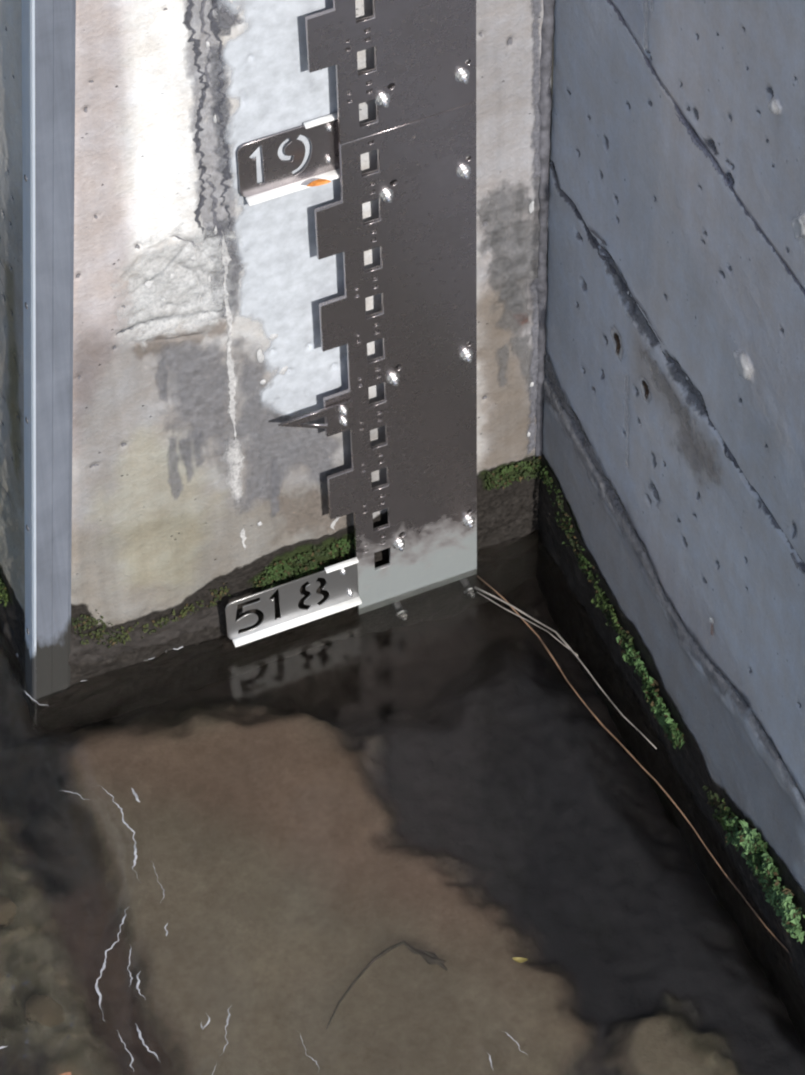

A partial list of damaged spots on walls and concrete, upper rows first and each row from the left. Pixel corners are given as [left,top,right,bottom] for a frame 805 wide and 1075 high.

crack [183,0,240,284]
leakage [212,47,232,172]
leakage [215,0,241,35]
leakage [157,219,337,517]
crack [527,278,539,454]
crack [529,0,805,573]
leakage [68,517,354,686]
leakage [373,511,388,528]
leakage [374,548,389,568]
leakage [469,453,805,990]
leakage [542,355,805,801]
crack [610,482,805,799]